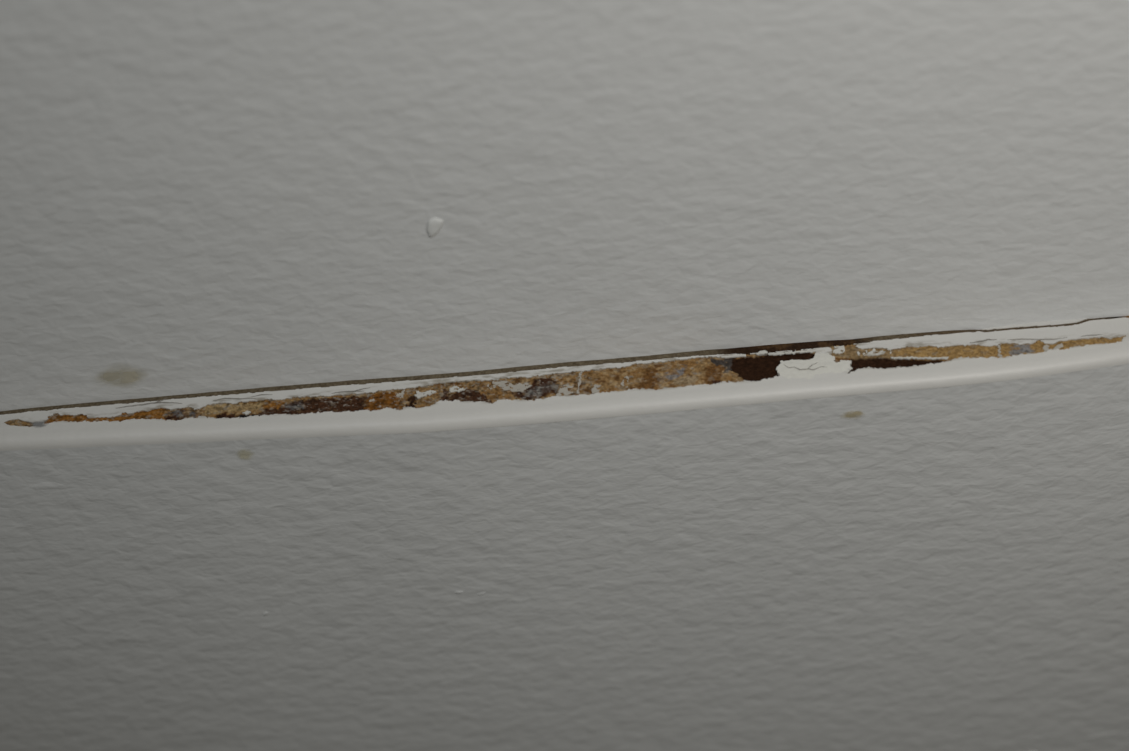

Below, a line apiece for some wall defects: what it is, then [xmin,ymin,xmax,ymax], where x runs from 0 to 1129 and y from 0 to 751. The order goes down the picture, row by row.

crack [0,316,1129,415]
peeling [5,336,1126,427]